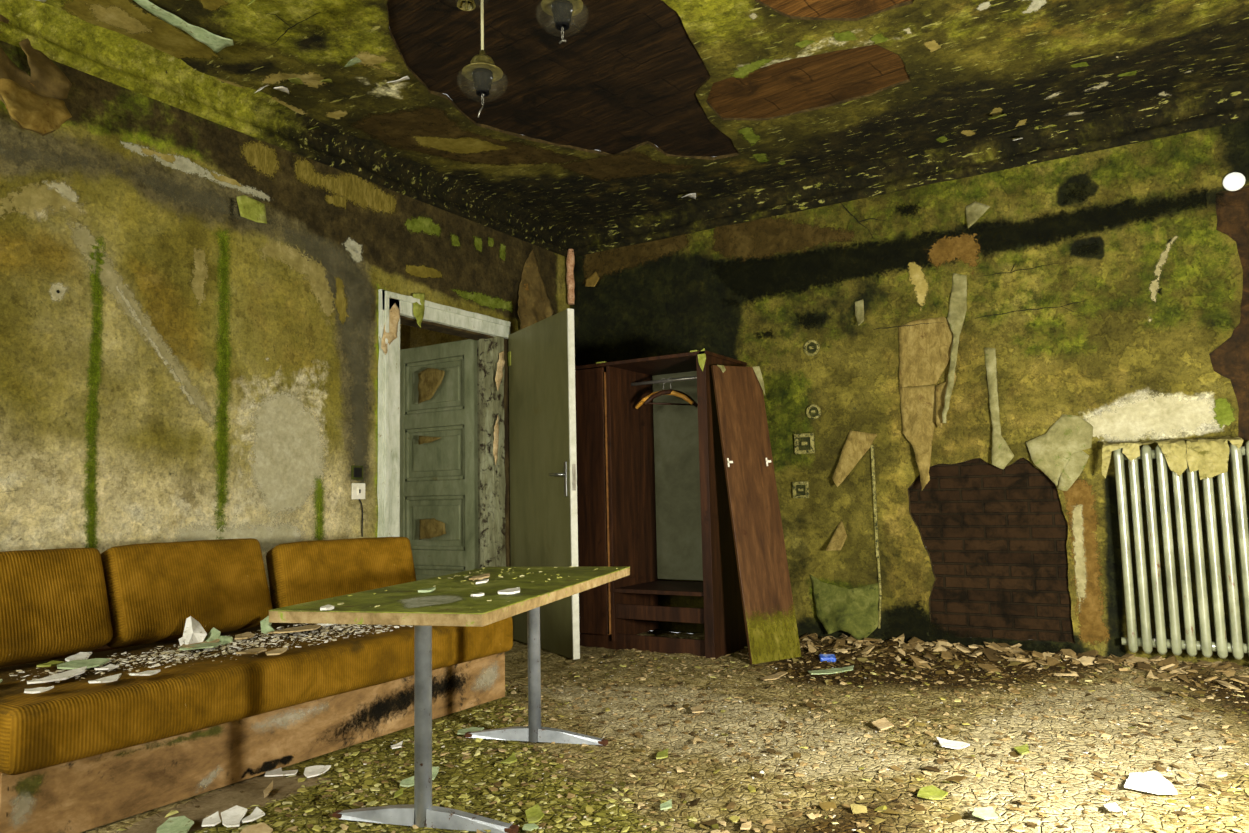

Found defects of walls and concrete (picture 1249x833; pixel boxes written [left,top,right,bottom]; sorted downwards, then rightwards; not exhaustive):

peeling [216,71,333,115]
spalling [308,1,785,181]
spalling [750,0,914,44]
peeling [923,40,941,52]
peeling [936,130,976,143]
peeling [988,107,1027,141]
peeling [1087,70,1137,90]
spalling [908,233,981,310]
damp [115,164,373,503]
flaking render [1209,185,1249,440]
damp [87,249,101,547]
flaking render [908,458,1110,646]